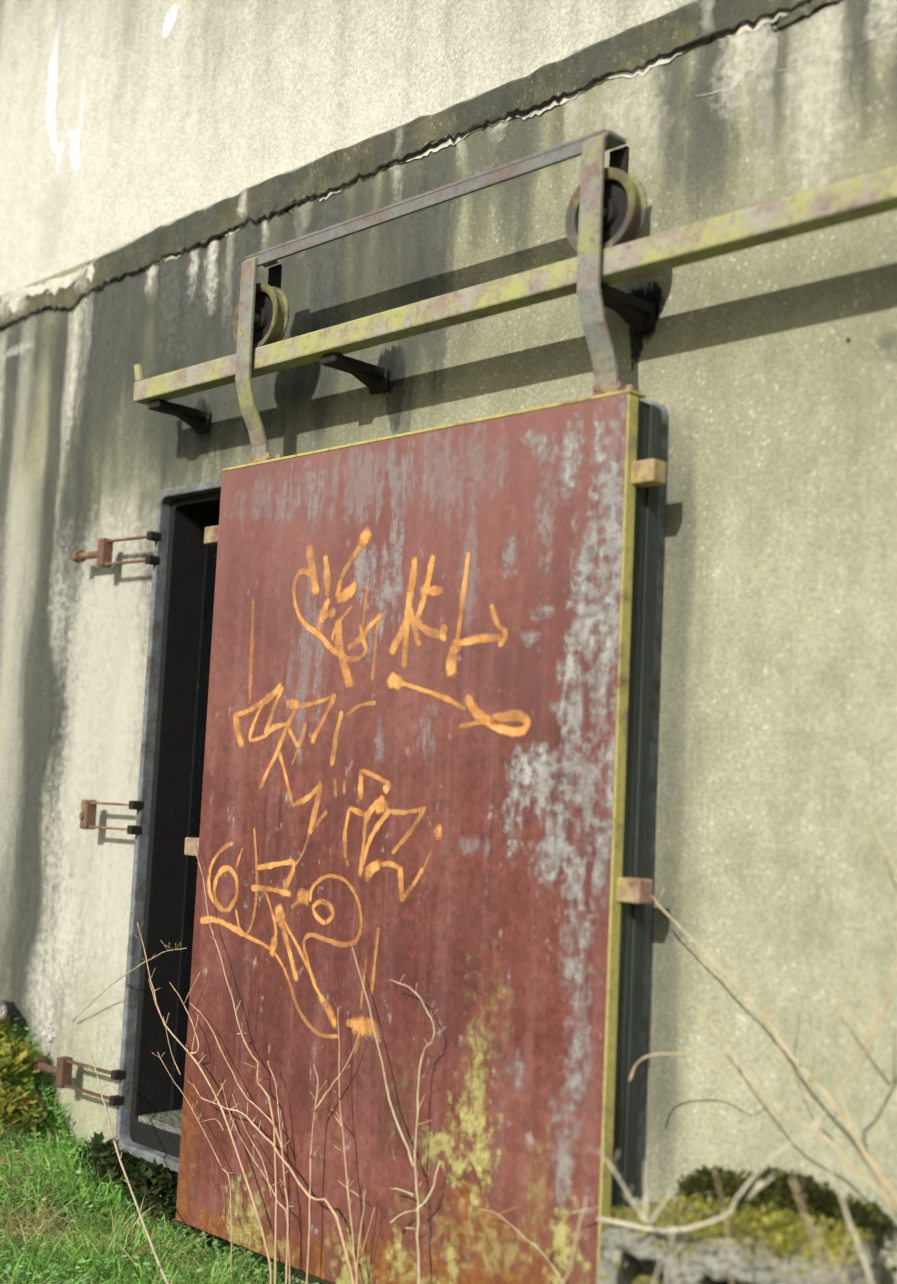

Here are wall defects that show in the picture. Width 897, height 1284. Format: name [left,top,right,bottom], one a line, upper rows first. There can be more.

crack [0,0,809,329]
damp [381,138,461,305]
damp [605,0,770,188]
damp [791,0,897,189]
damp [0,188,368,1095]
peeling [503,420,625,1005]
corrosion [201,1214,300,1264]
corrosion [364,1185,521,1284]
peeling [558,1143,572,1191]